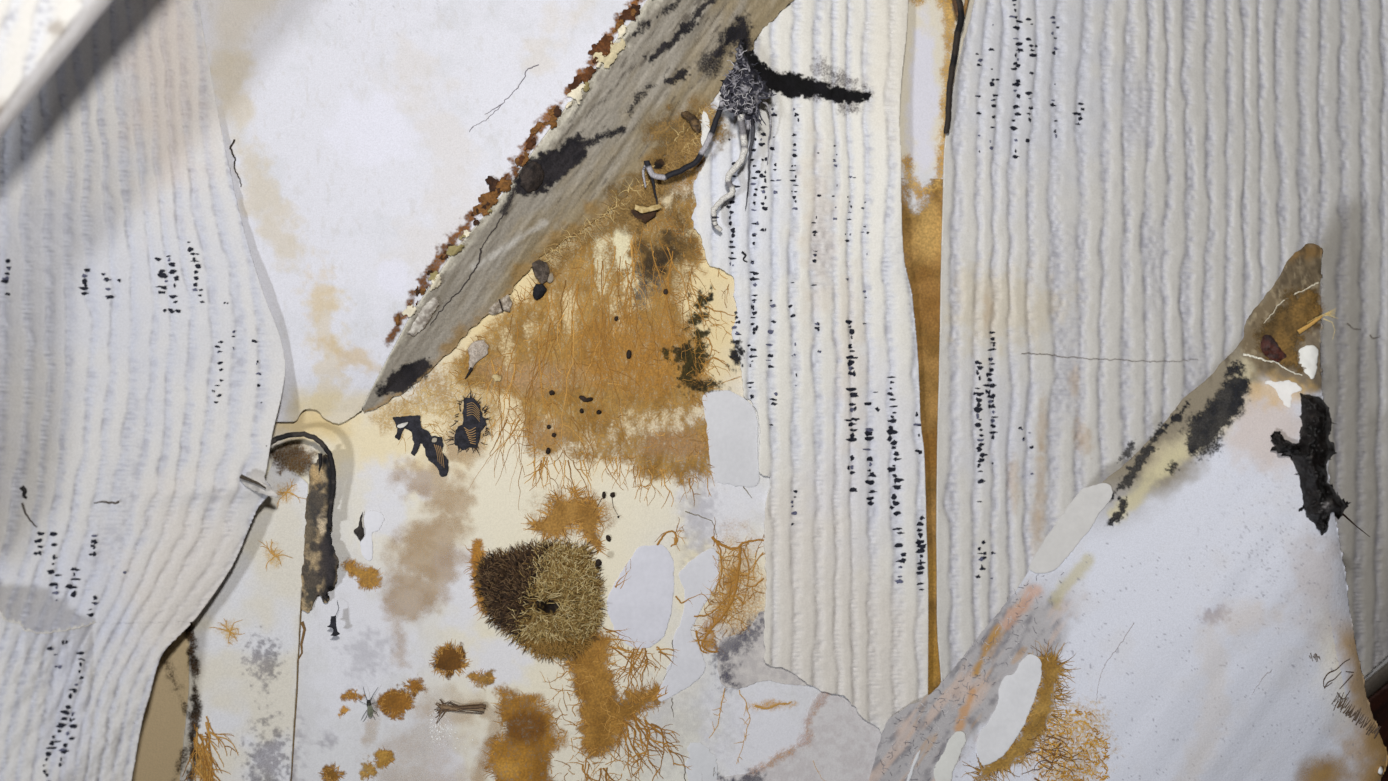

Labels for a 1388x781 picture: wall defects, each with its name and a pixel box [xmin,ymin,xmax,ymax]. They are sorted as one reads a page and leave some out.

rust [386,0,642,342]
peeling [393,340,491,477]
peeling [532,259,554,300]
water stain [342,16,799,619]
peeling [702,390,760,487]
water stain [845,0,1111,781]
water stain [1108,360,1251,526]
peeling [1260,334,1319,408]
water stain [1270,393,1370,537]
water stain [338,517,765,781]
peeling [607,544,719,701]
peeling [934,654,1042,781]